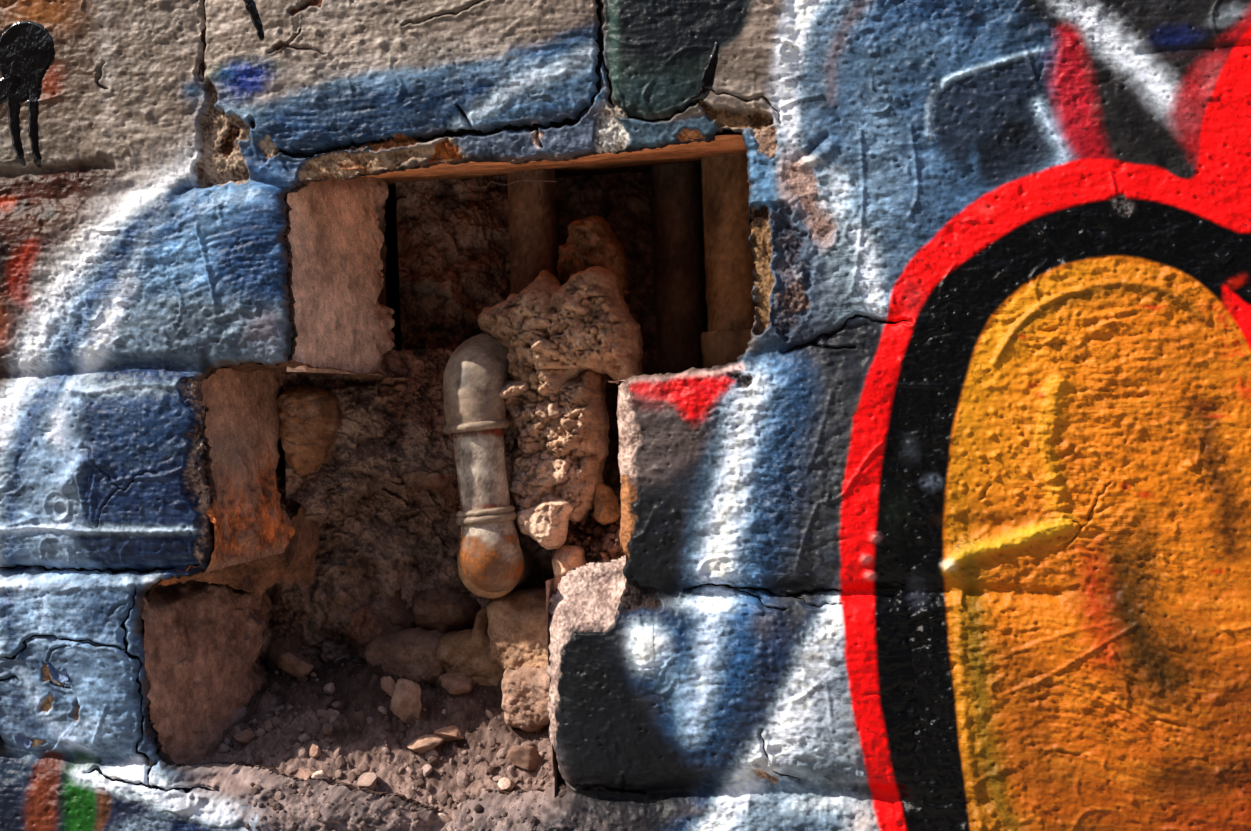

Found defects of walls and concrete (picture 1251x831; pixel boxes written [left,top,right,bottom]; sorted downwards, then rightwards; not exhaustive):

crack [198,0,207,80]
crack [783,314,909,353]
peeling [727,372,755,390]
spalling [177,377,211,564]
rust [460,534,524,593]
spalling [547,380,663,768]
crack [0,565,220,793]
peeling [750,757,780,786]